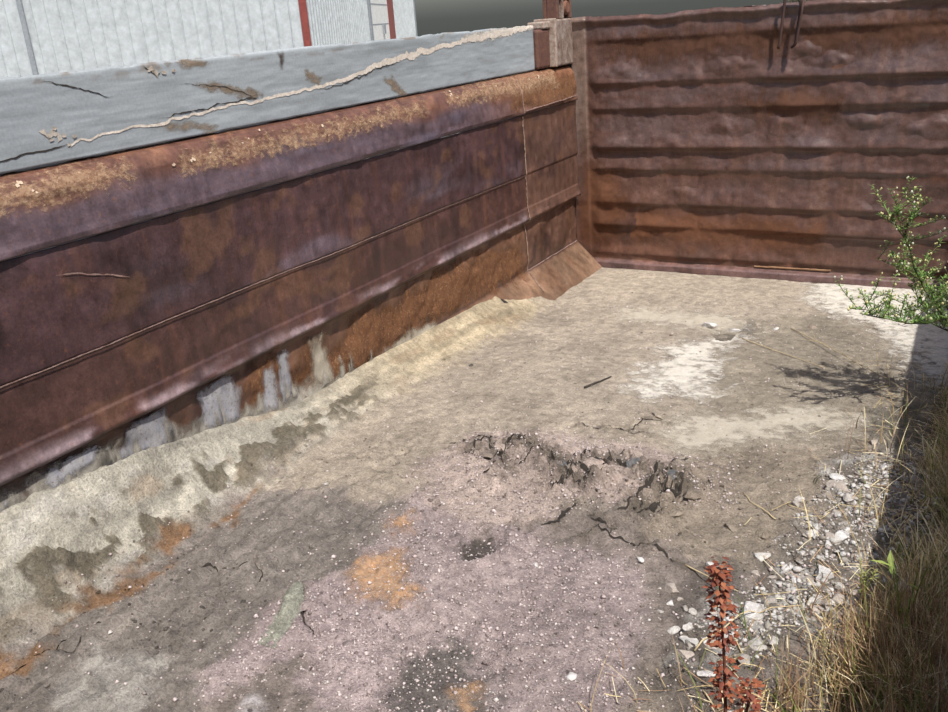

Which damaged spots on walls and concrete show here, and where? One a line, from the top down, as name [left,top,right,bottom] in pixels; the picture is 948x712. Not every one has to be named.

corrosion [608,24,785,62]
corrosion [803,8,948,54]
crack [0,25,533,162]
corrosion [511,72,577,112]
corrosion [743,88,843,121]
corrosion [583,167,817,247]
corrosion [246,247,526,410]
crack [449,418,688,562]